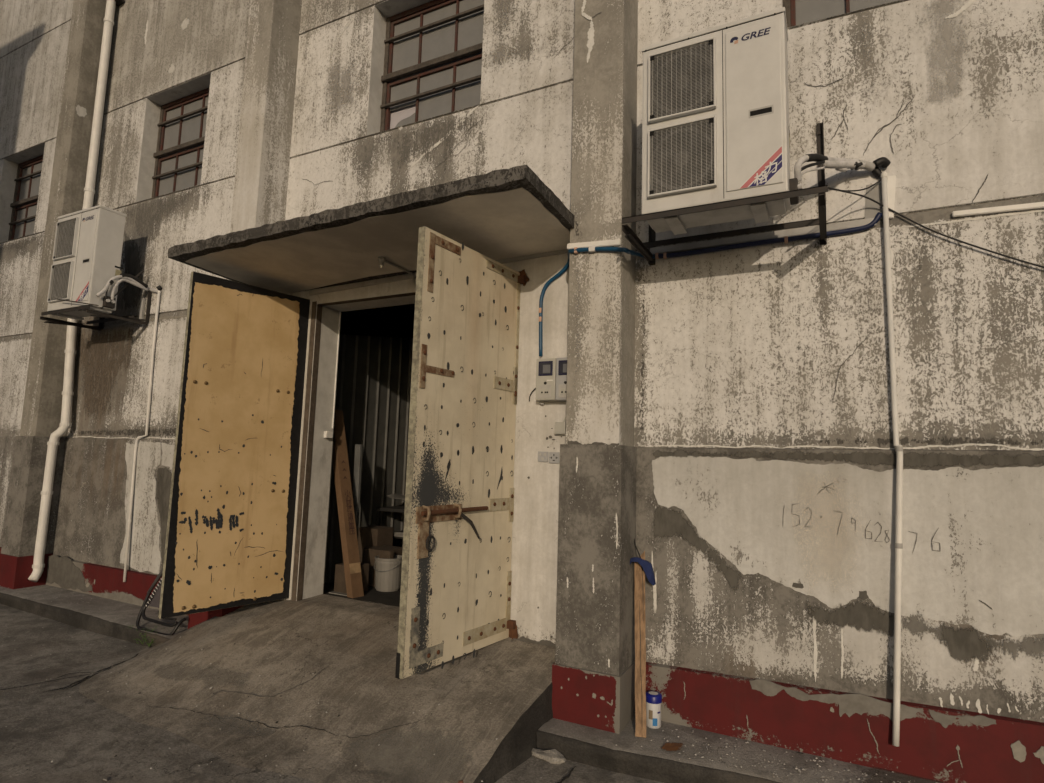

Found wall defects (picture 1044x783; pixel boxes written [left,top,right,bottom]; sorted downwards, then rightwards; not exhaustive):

peeling [652,456,1044,637]
peeling [749,679,996,728]